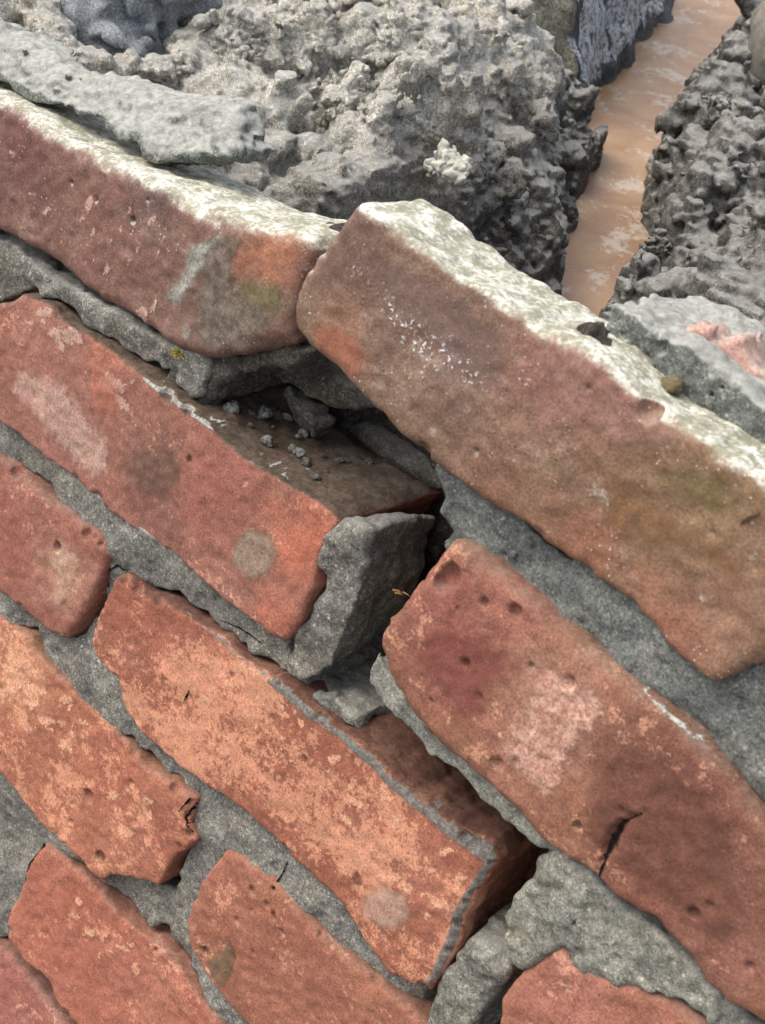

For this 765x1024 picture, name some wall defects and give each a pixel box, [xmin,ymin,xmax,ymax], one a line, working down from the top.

crack [178,791,200,832]
crack [599,812,642,877]